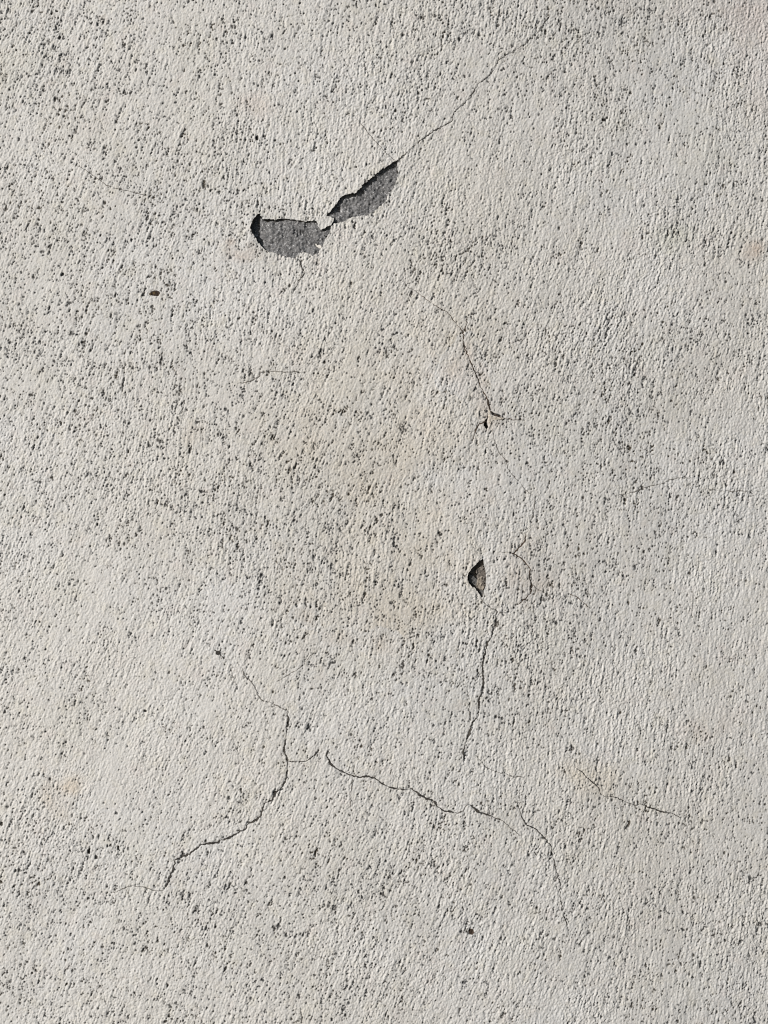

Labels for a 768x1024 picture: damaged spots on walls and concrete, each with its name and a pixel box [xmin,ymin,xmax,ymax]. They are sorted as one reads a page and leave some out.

peeling [250,161,398,258]
spalling [467,559,486,597]
crack [113,654,569,935]